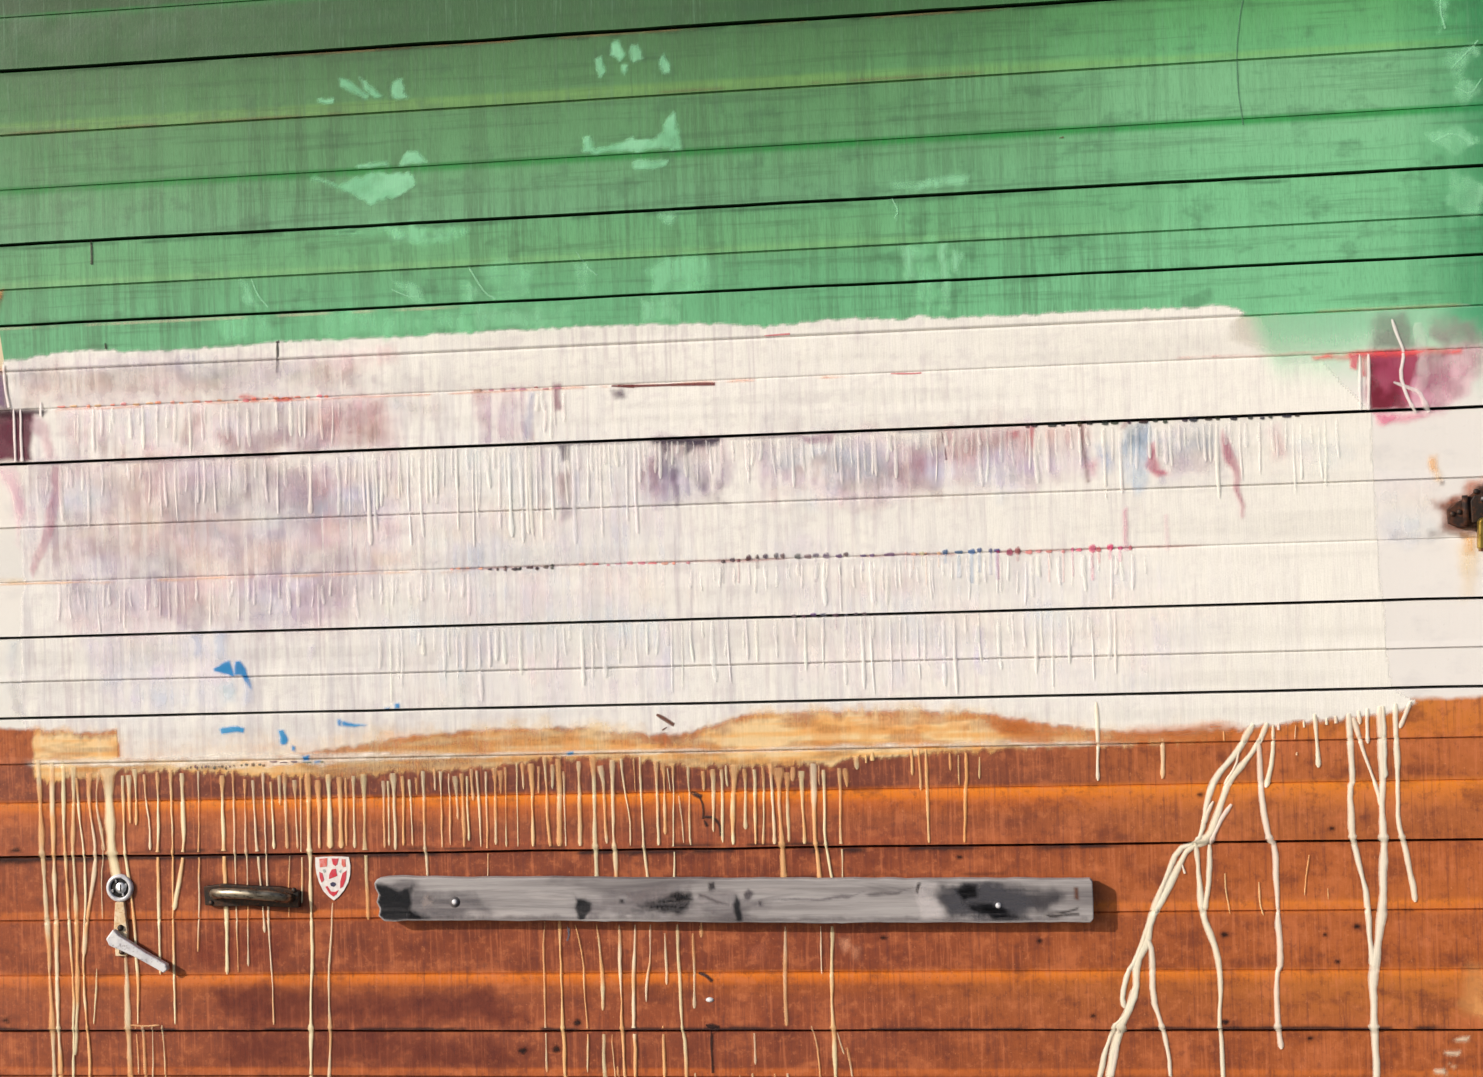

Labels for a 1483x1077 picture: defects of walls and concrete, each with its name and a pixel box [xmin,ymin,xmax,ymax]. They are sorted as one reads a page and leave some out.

corrosion [1440,485,1483,545]